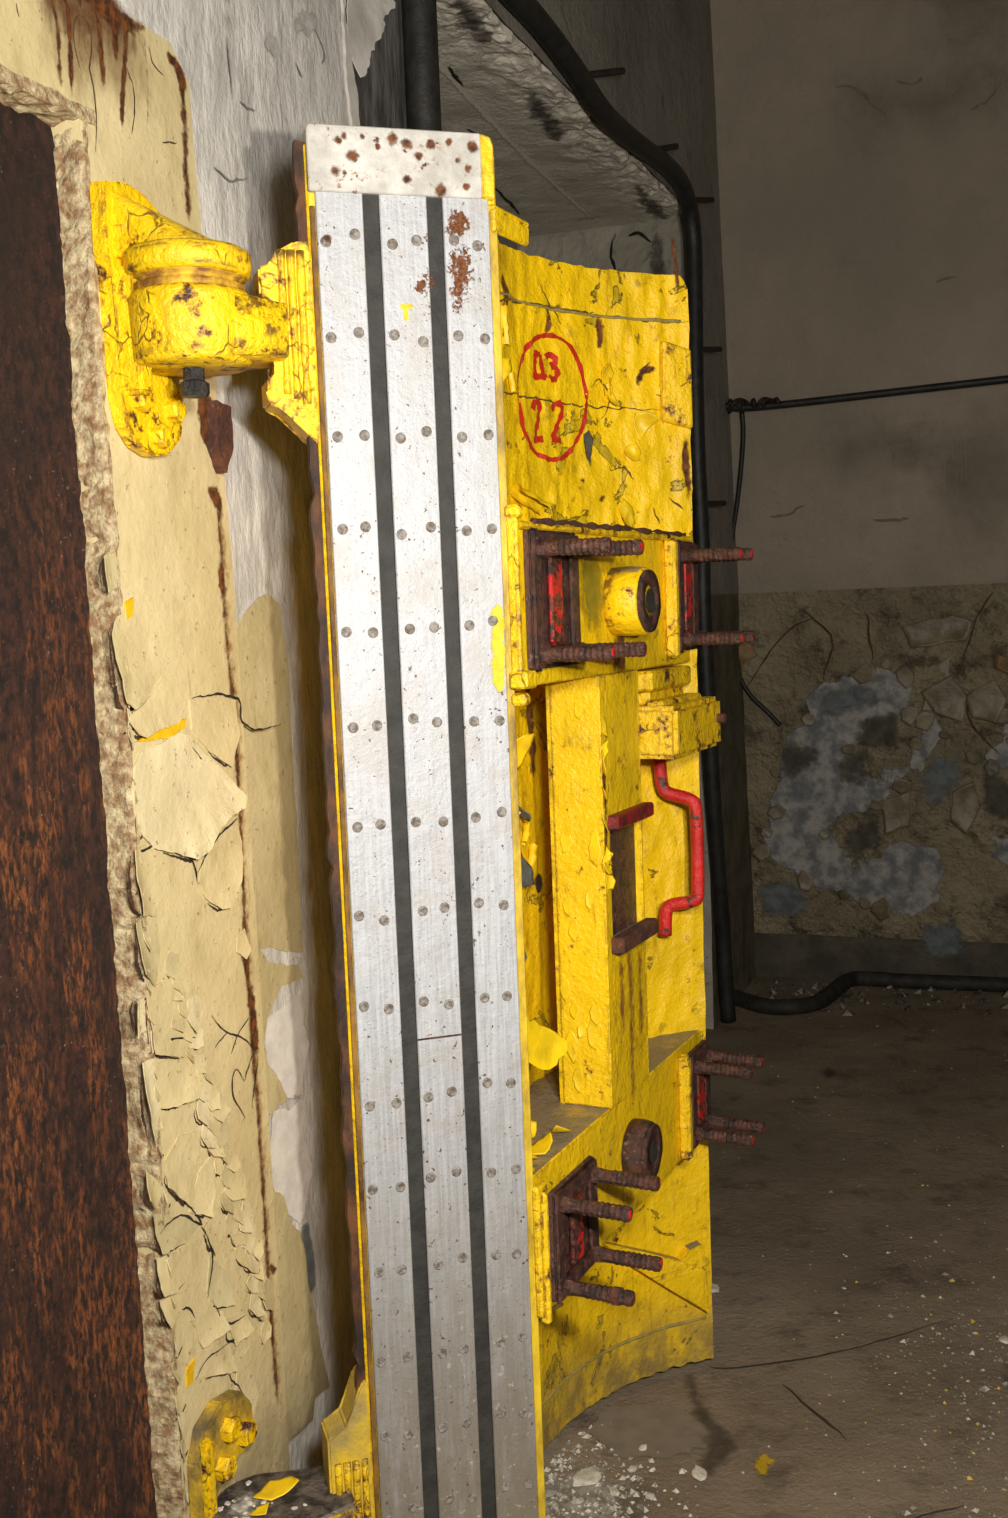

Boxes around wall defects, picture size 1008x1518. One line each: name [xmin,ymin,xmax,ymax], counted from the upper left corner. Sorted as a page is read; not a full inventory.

rust [46,0,144,124]
peeling [340,0,395,126]
rust [167,52,191,215]
rust [197,397,237,707]
crack [192,692,280,731]
crack [747,611,873,687]
crack [189,818,238,882]
rust [239,810,248,934]
peeling [751,658,1008,958]
crack [149,1016,258,1118]
peeling [101,552,329,1516]
rust [243,956,277,1278]